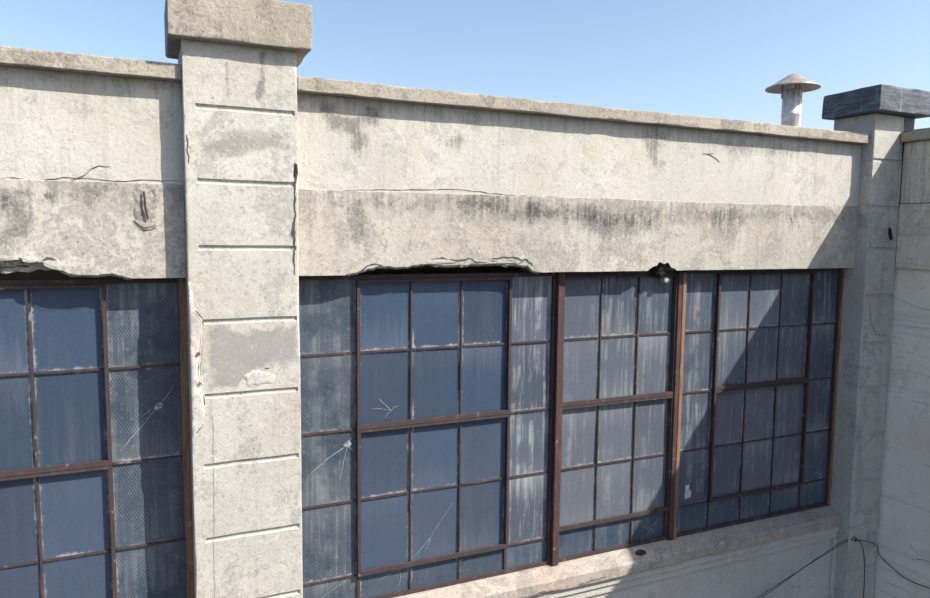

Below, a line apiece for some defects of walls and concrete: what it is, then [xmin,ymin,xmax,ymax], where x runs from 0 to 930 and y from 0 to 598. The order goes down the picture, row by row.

crack [0,134,189,182]
water stain [0,191,33,243]
water stain [460,194,550,224]
water stain [578,206,651,238]
spalling [0,255,132,280]
spalling [347,256,539,276]
spalling [652,263,677,282]